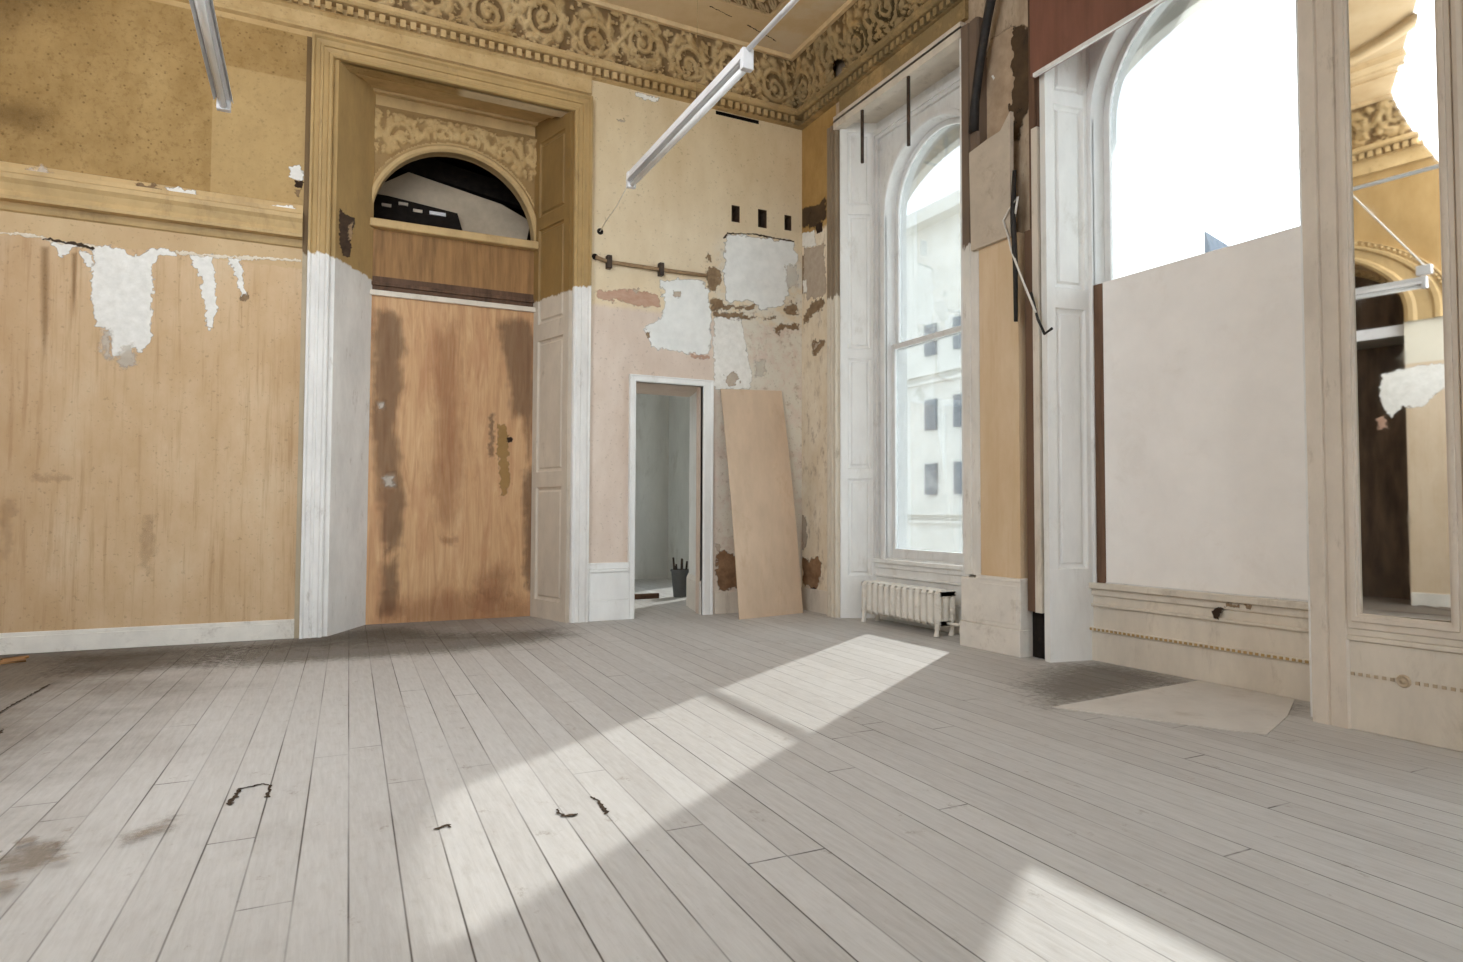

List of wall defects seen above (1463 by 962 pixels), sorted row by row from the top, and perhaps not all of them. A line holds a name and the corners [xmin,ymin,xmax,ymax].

flaking render [51,242,249,367]
flaking render [597,222,826,390]
water stain [375,314,402,546]
water stain [503,322,533,418]
water stain [489,414,532,580]
spalling [715,544,737,591]
spalling [802,515,822,589]